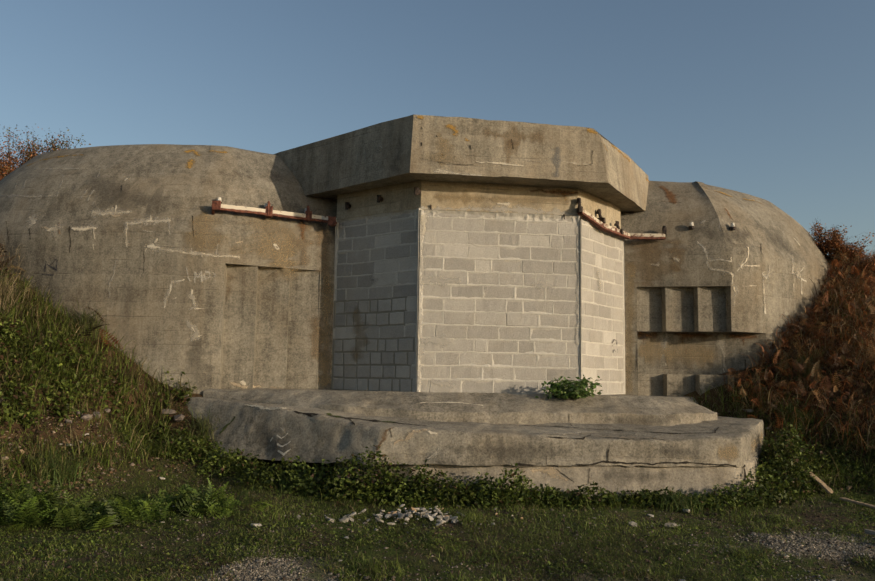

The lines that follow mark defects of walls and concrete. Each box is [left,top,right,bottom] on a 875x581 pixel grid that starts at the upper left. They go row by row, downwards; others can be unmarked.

crack [518,417,746,486]